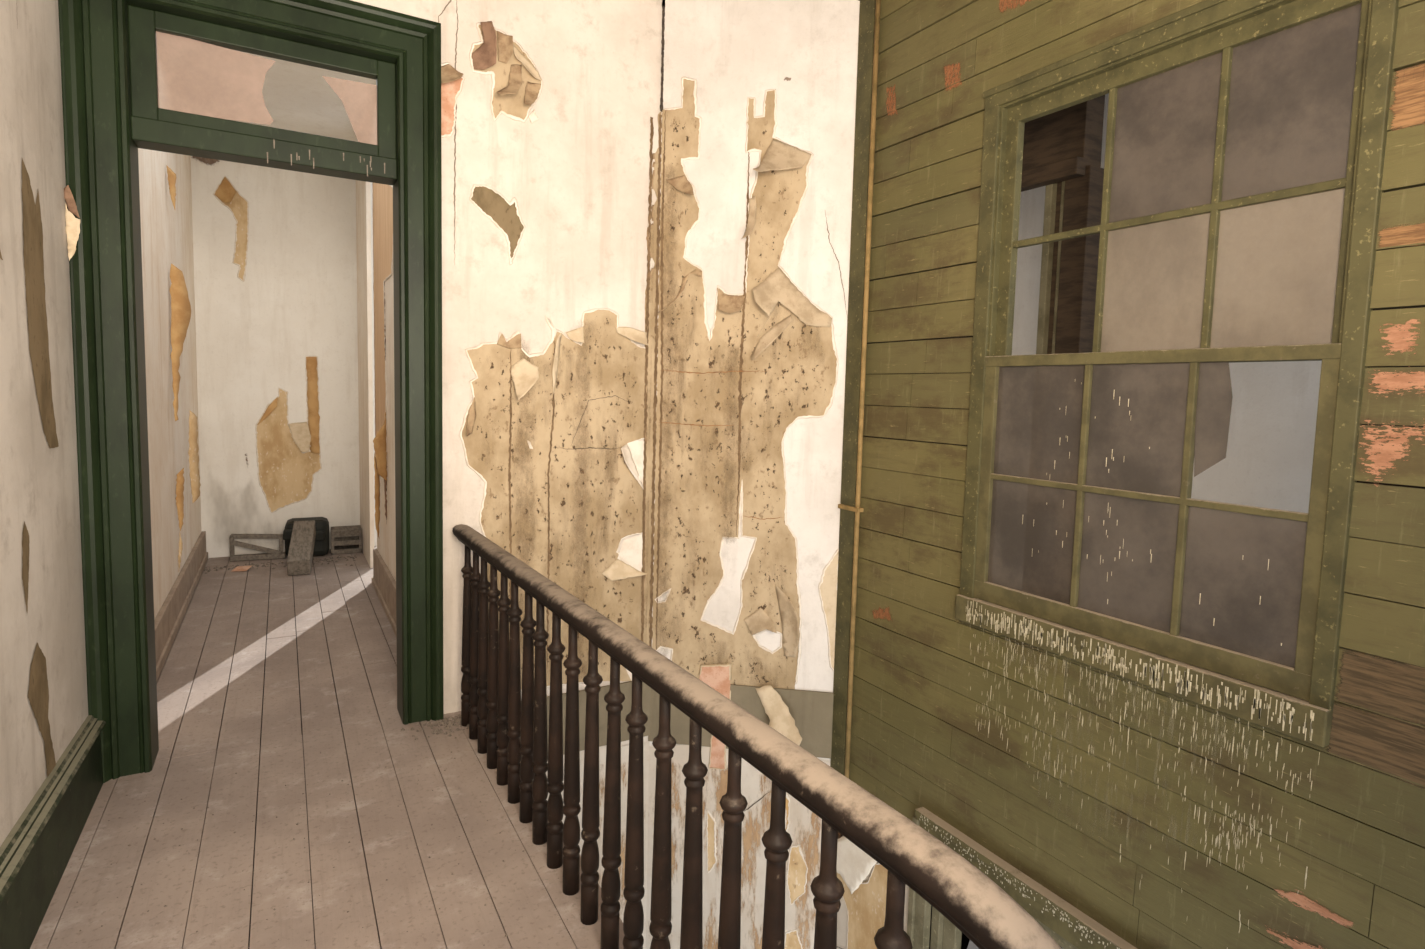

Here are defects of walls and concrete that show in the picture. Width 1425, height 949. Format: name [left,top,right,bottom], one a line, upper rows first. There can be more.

flaking render [441,21,542,138]
peeling [1389,64,1425,131]
peeling [64,185,80,261]
peeling [1377,223,1425,248]
flaking render [22,159,59,448]
flaking render [460,77,839,700]
peeling [1368,319,1425,399]
peeling [245,356,322,513]
peeling [1358,418,1425,487]
water stain [966,600,1320,888]
peeling [1266,926,1322,949]
peeling [1276,889,1353,929]